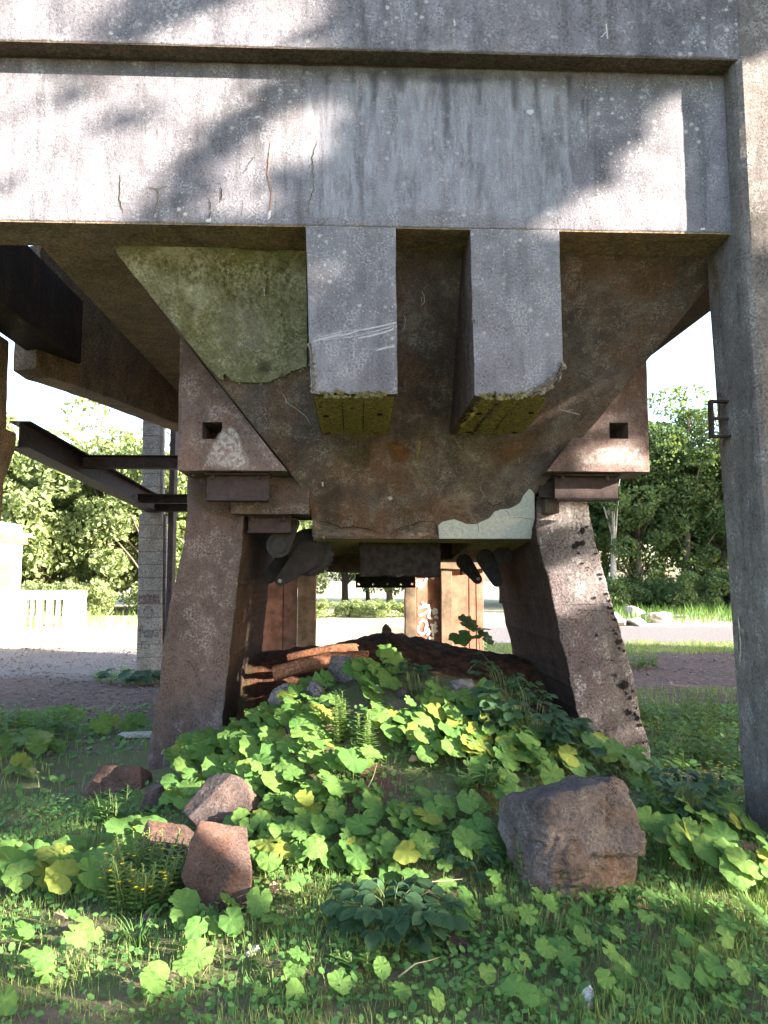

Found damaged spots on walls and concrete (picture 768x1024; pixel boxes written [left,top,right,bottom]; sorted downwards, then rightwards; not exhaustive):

crack [246,144,273,244]
crack [308,141,318,214]